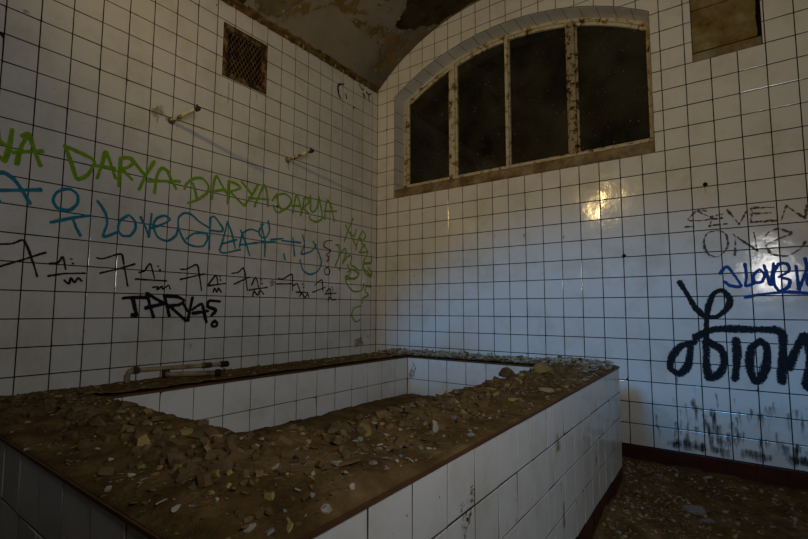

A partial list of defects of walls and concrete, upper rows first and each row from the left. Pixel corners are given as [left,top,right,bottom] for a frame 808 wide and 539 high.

spalling [221,0,476,93]